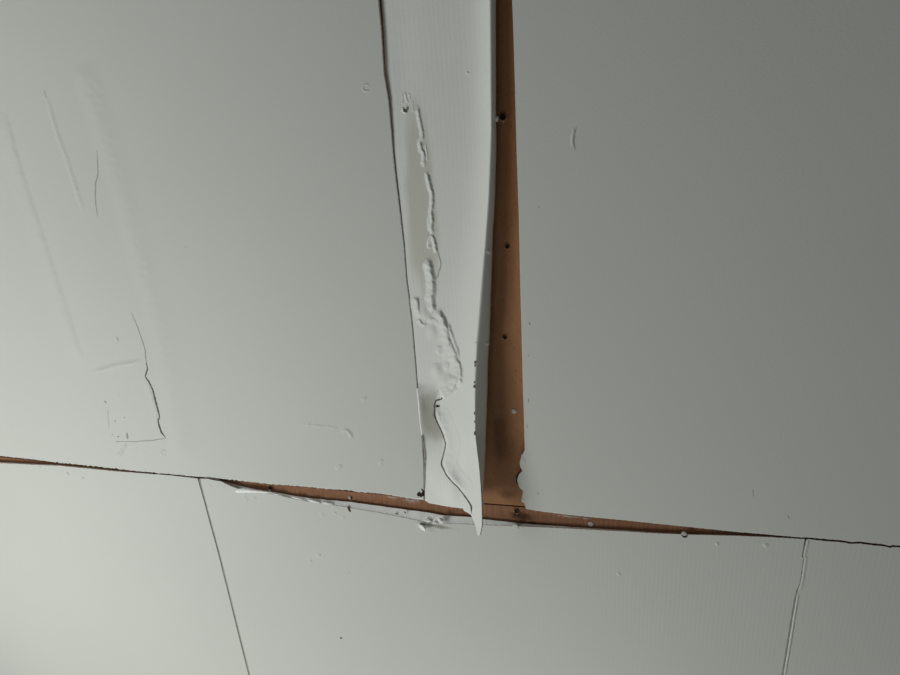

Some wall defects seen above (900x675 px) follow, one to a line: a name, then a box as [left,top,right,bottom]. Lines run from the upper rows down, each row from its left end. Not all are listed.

peeling [380,0,497,536]
crack [119,315,166,442]
crack [781,542,806,675]